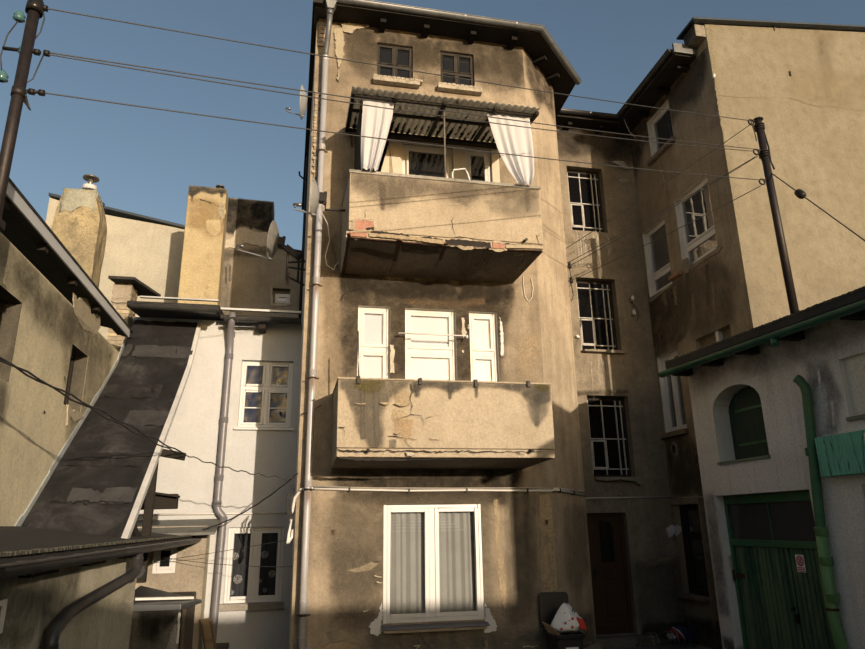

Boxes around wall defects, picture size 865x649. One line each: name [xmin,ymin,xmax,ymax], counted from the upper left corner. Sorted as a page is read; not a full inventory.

peeling [317,18,369,82]
spalling [217,202,226,220]
spalling [342,217,543,275]
peeling [72,292,100,337]
leakage [340,379,480,447]
leakage [494,383,551,426]
leakage [0,567,78,620]